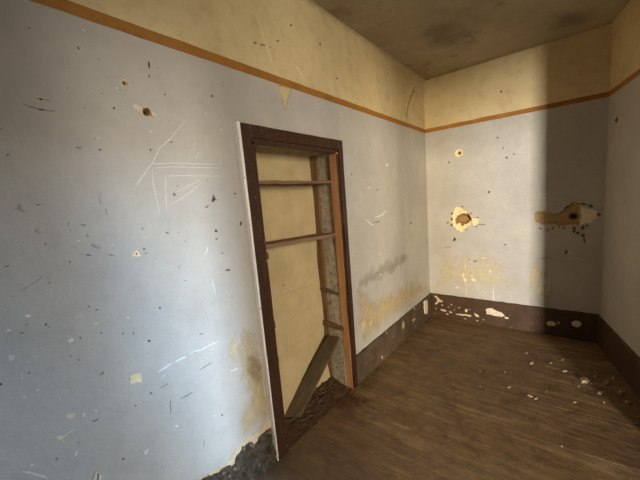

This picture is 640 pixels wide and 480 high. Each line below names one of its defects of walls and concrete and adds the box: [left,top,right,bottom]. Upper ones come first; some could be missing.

spalling [132,104,157,117]
spalling [447,206,485,232]
spalling [534,202,601,244]
peeling [435,296,509,321]
water stain [244,336,267,428]
flaking render [197,419,277,480]